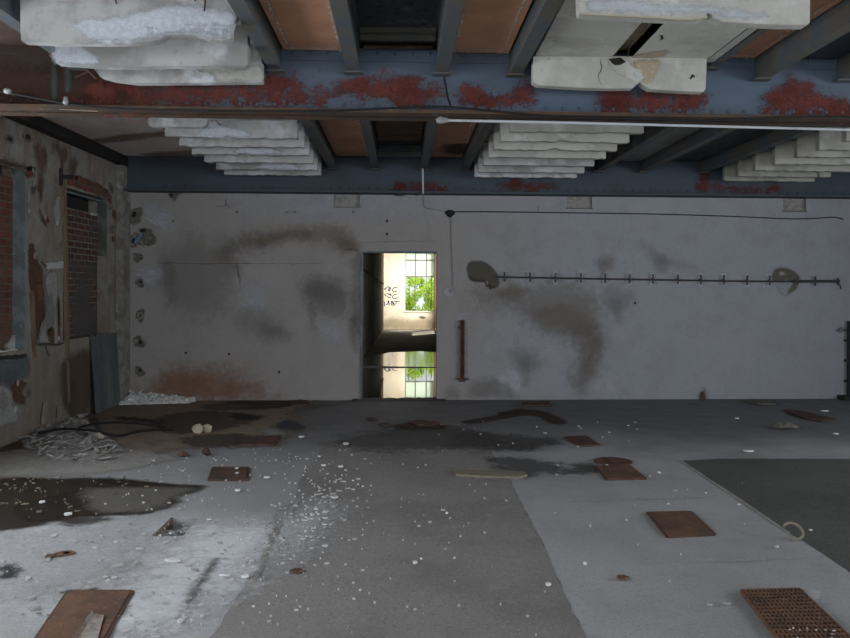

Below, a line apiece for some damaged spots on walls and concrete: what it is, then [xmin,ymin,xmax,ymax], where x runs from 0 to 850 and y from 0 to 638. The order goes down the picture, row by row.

flaking render [40,174,116,242]
spalling [130,207,157,263]
flaking render [28,243,61,347]
spalling [0,335,27,361]
flaking render [0,378,31,427]